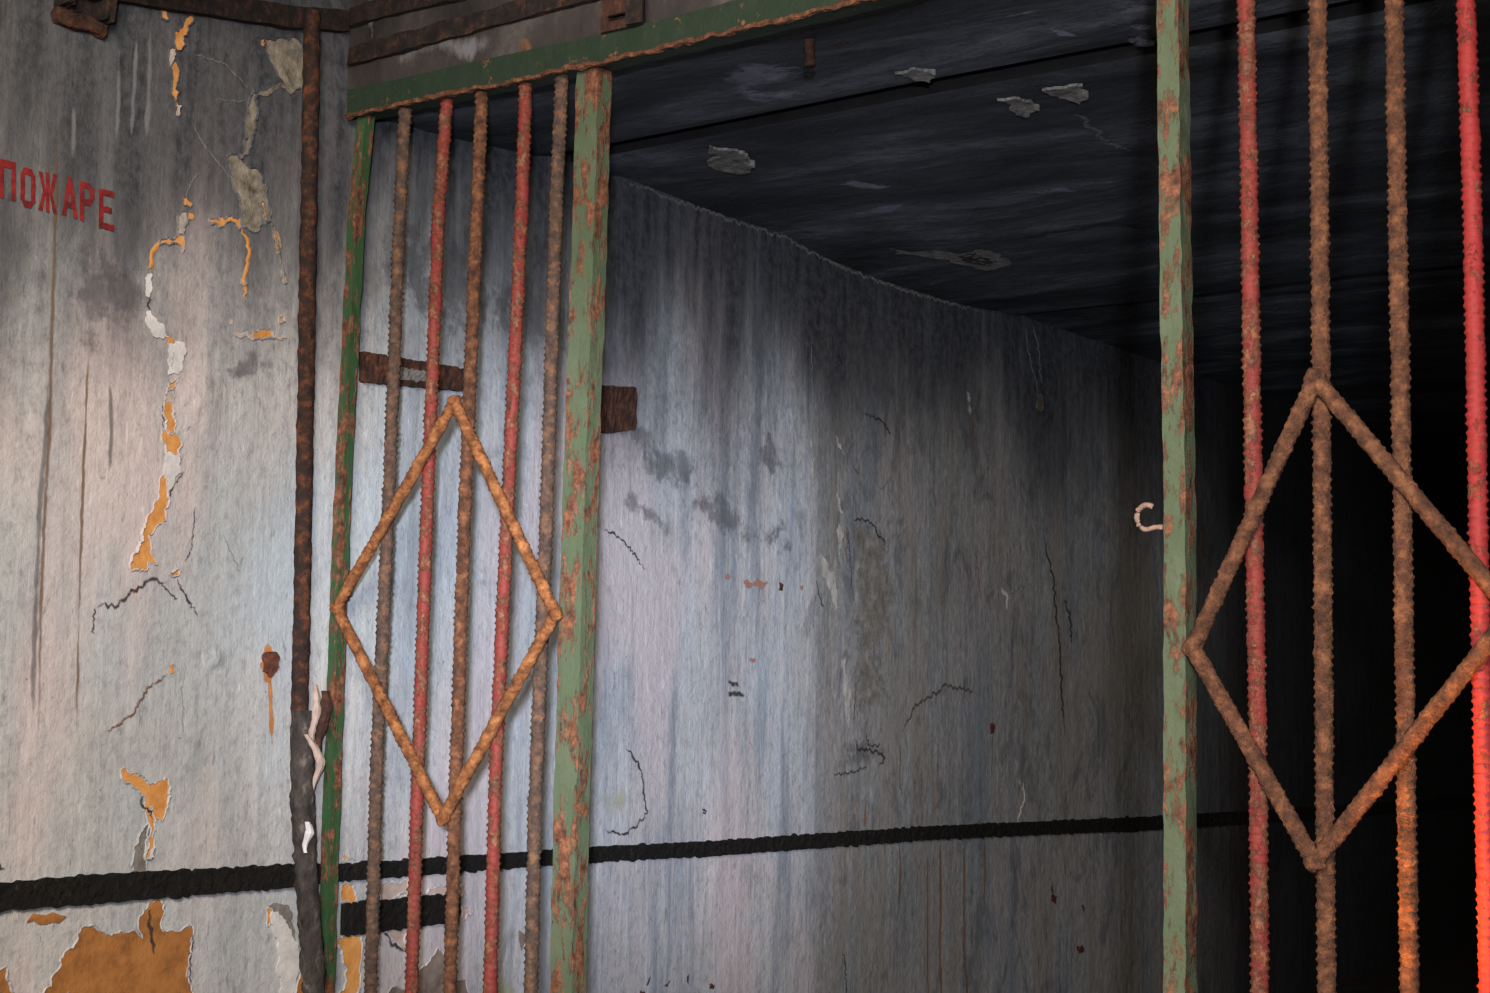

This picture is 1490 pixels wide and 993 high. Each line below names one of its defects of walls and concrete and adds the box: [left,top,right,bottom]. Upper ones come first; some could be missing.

peeling [160,10,195,116]
peeling [997,83,1089,119]
spalling [128,36,303,578]
crack [606,529,643,565]
crack [91,577,197,633]
crack [108,664,184,731]
corrosion [260,644,280,735]
crack [899,683,972,794]
peeling [119,767,171,872]
crack [608,751,648,835]
peeling [27,912,66,925]
peeling [42,899,195,993]